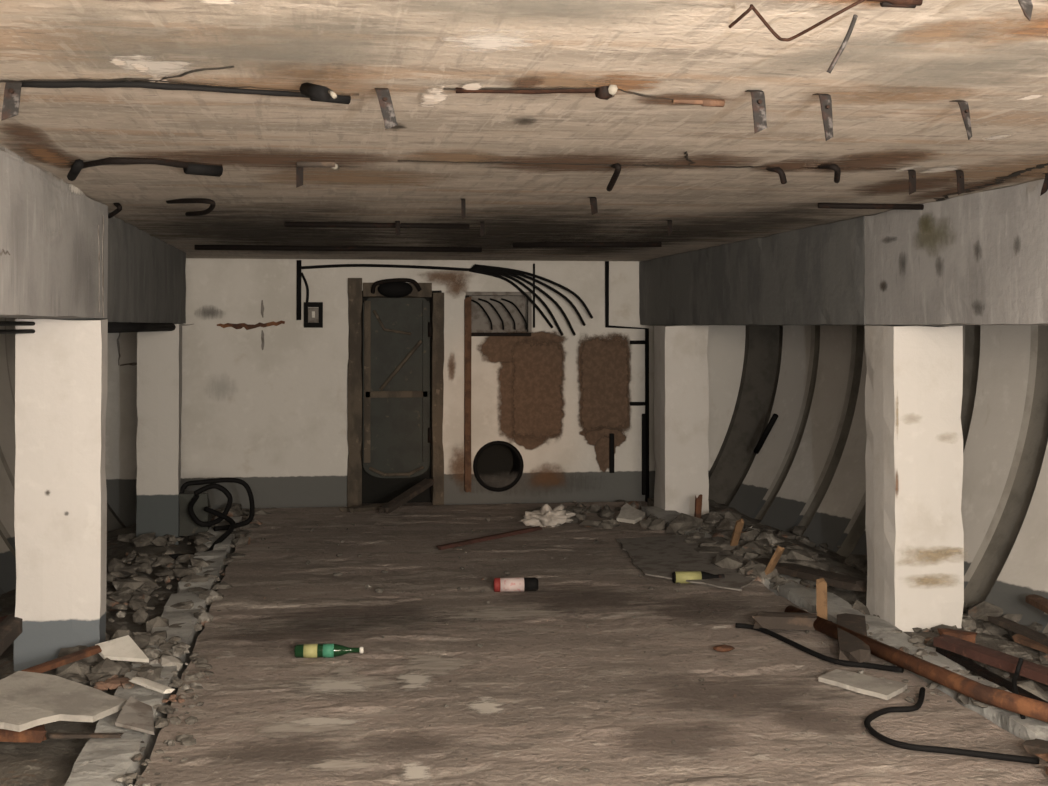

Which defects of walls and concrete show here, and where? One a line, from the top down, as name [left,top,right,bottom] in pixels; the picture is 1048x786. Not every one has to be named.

rust [910,19,1048,42]
peeling [478,331,631,472]